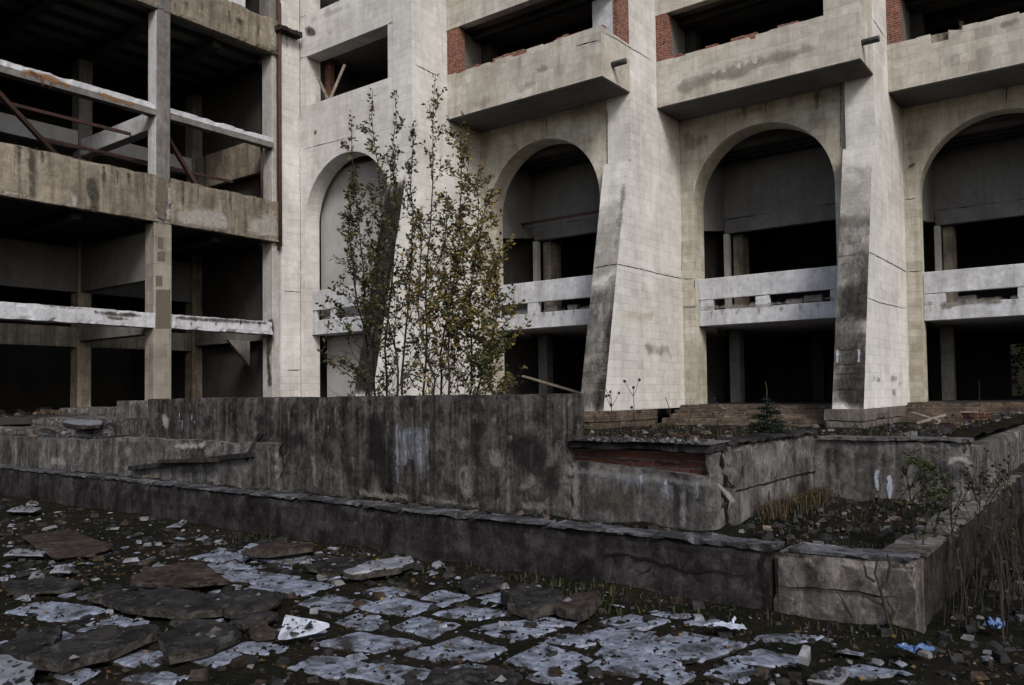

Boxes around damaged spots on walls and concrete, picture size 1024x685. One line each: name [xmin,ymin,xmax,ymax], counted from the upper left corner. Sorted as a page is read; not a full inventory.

corrosion [23,70,70,87]
water stain [17,145,44,194]
water stain [87,166,130,211]
flaking render [574,448,707,475]
crack [720,449,815,526]
crack [602,551,905,609]